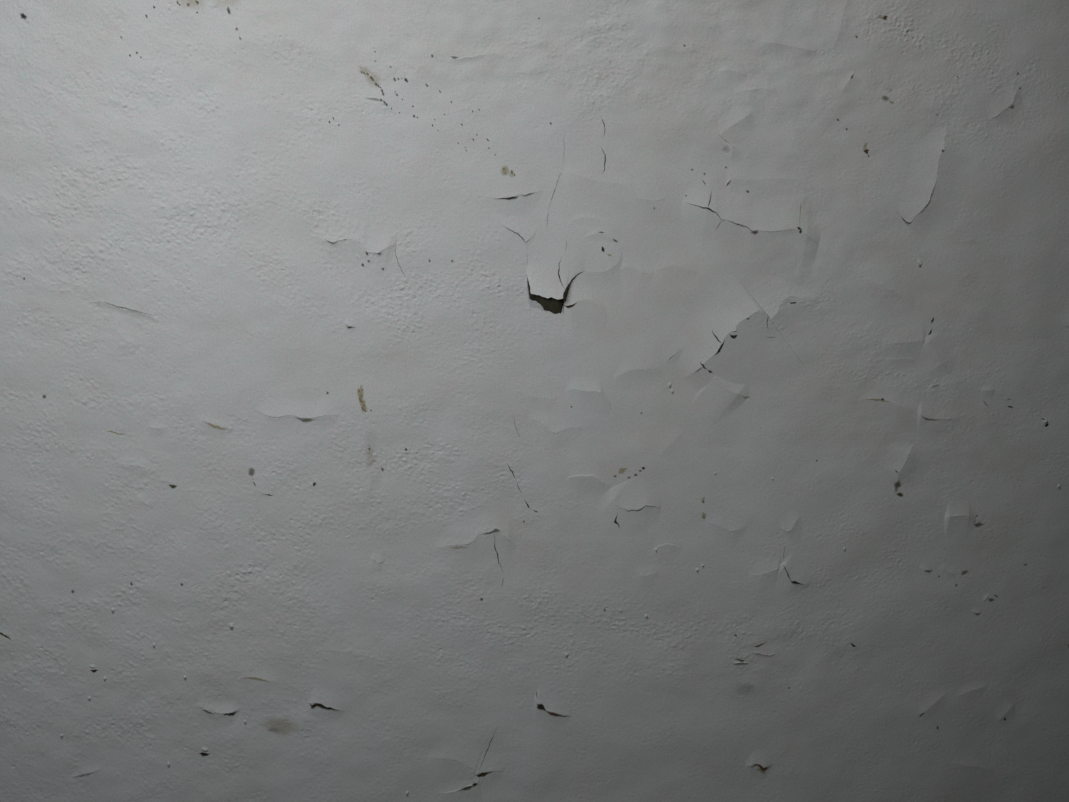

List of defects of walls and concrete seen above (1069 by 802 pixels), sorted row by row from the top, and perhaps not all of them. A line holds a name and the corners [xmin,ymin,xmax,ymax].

peeling [526,241,607,341]
peeling [676,274,831,415]
peeling [195,696,241,731]